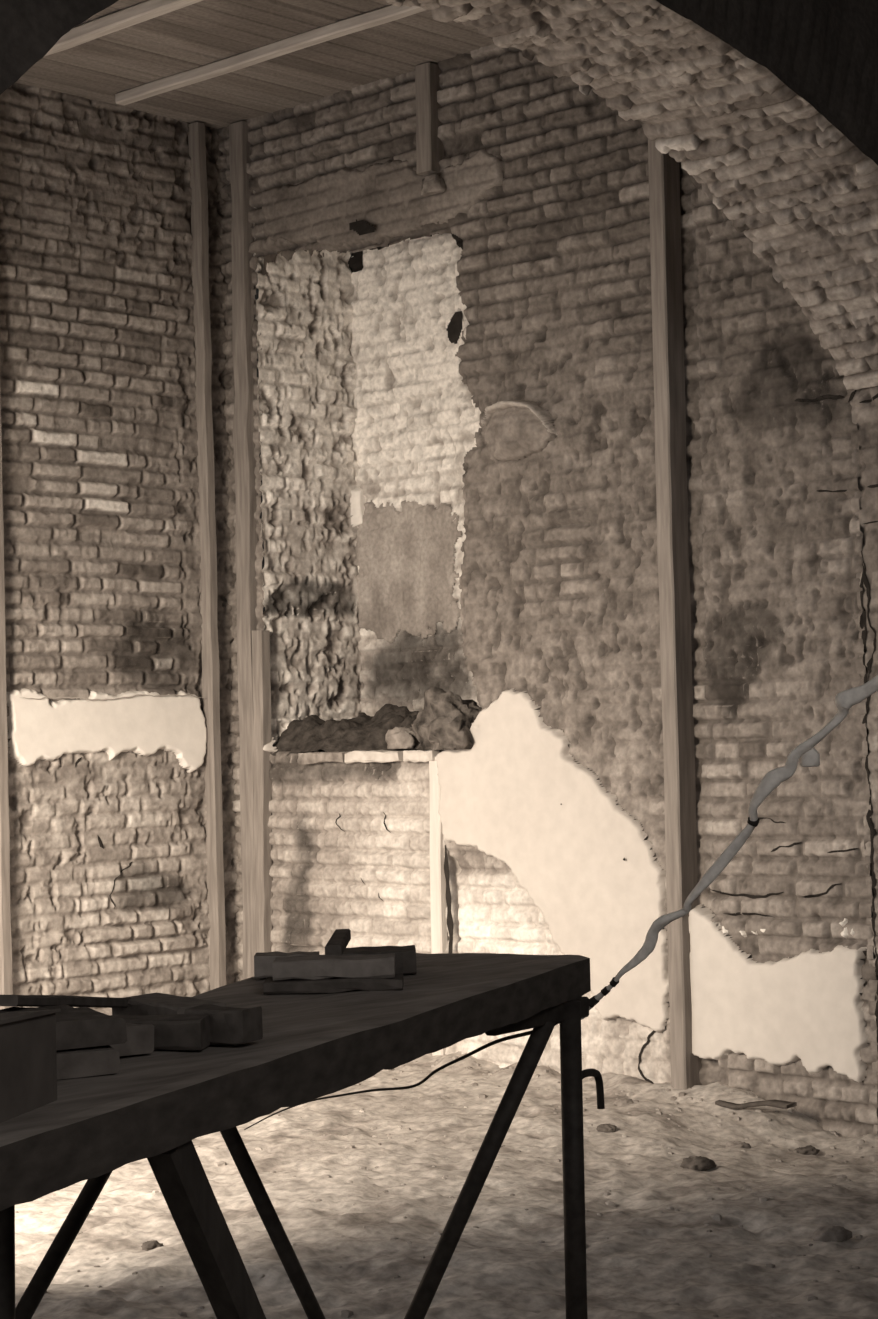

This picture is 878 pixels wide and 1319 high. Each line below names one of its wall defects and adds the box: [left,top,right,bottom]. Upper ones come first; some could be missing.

crack [795,390,878,403]
crack [817,484,878,492]
crack [710,521,878,1052]
peeling [716,923,765,937]
peeling [839,918,854,938]